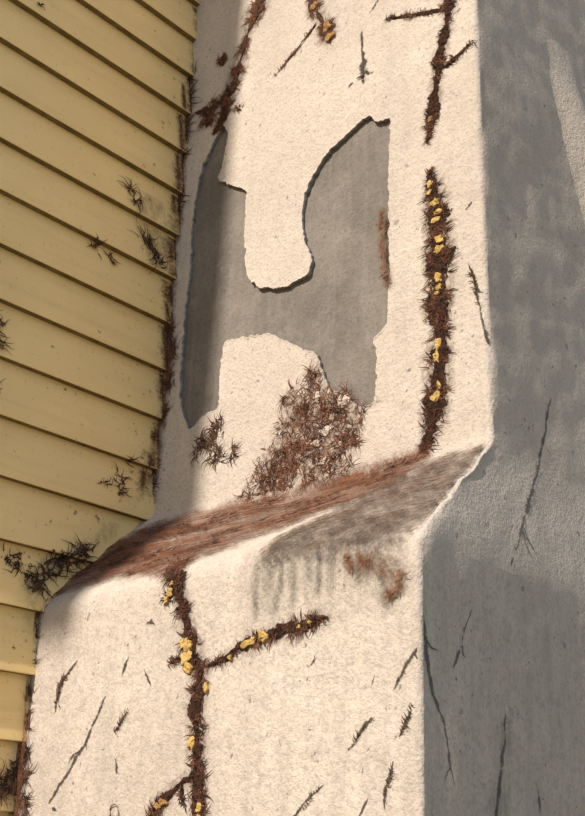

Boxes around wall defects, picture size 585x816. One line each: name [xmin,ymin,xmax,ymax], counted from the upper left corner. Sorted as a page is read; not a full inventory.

crack [195,0,267,135]
crack [272,0,338,77]
crack [348,31,374,87]
crack [370,0,478,145]
spalling [178,114,392,504]
crack [416,166,490,456]
rust [46,440,440,601]
leakage [255,444,484,606]
crack [144,554,328,816]
rust [9,734,25,816]
crack [358,762,396,816]